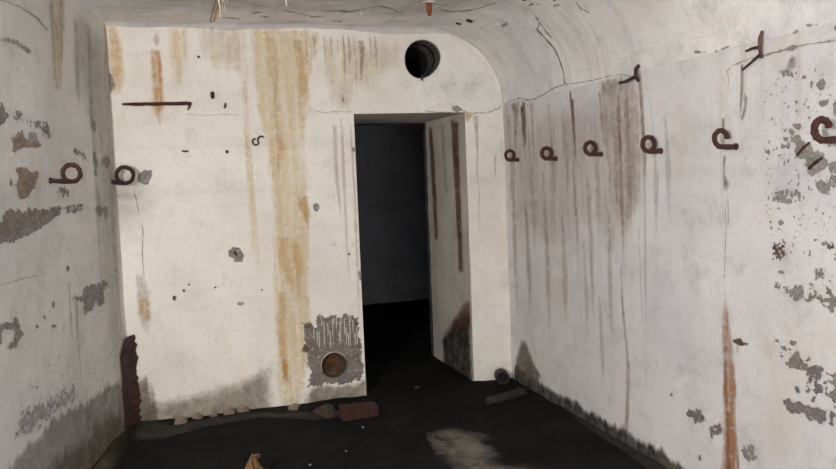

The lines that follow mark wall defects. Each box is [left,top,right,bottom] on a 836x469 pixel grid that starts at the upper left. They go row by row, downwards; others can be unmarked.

crack [694,41,832,89]
peeling [764,66,836,116]
peeling [73,148,110,176]
peeling [0,167,83,244]
spalling [764,98,836,313]
peeling [0,317,24,350]
damp [14,384,126,469]
damp [139,377,267,421]
peeling [302,314,364,388]
damp [515,343,681,469]
corrosion [723,362,739,469]
peeling [775,339,836,426]